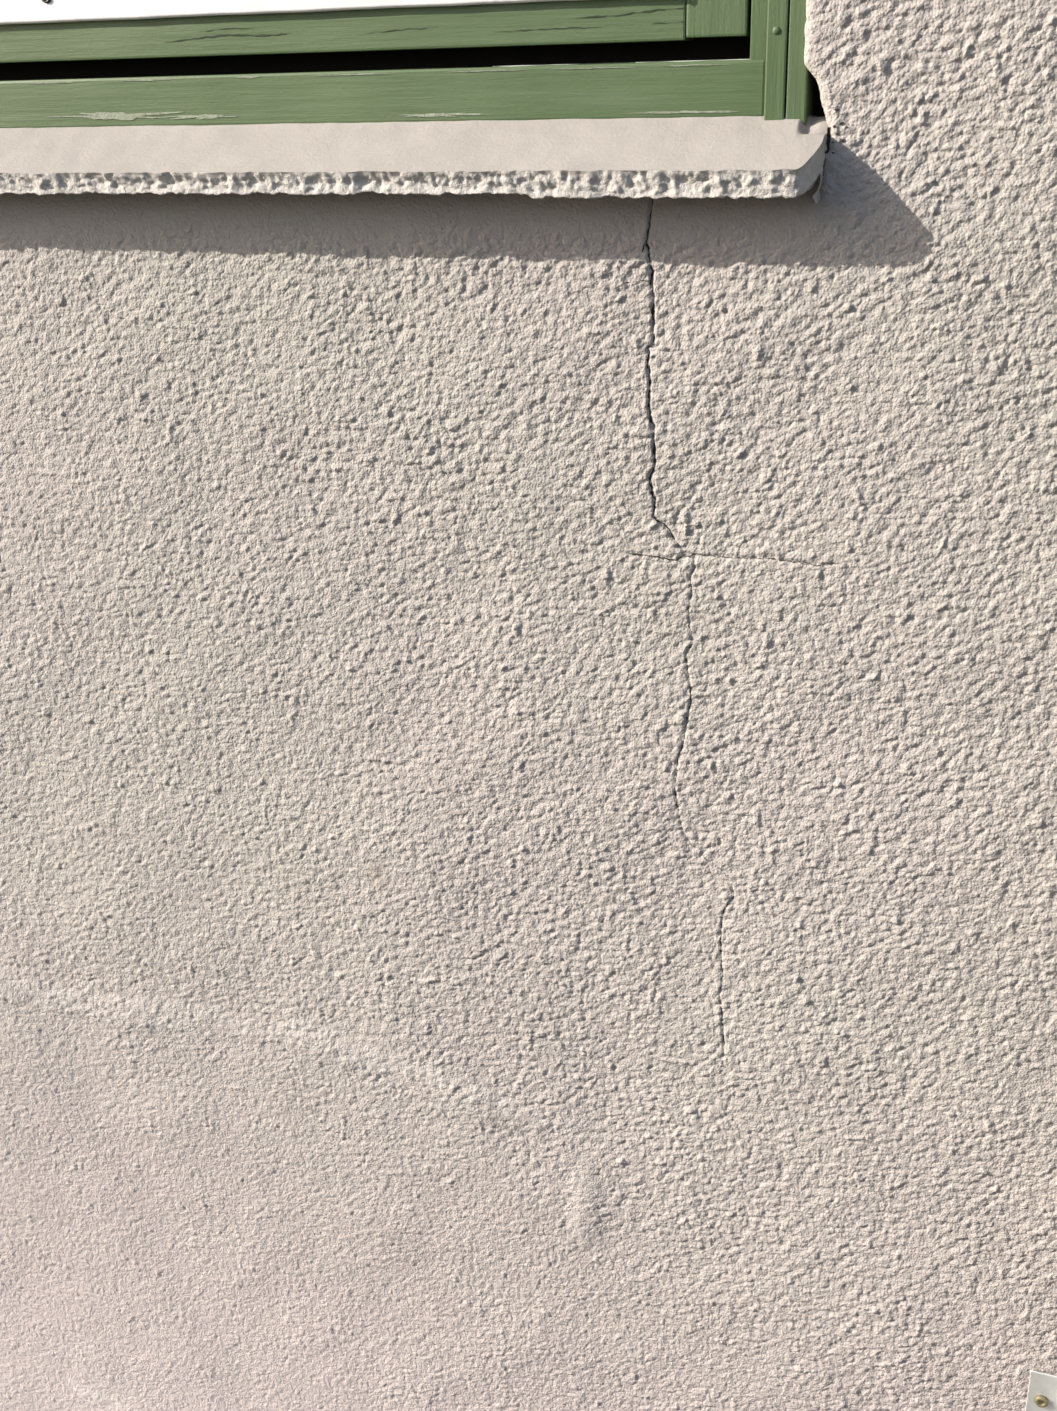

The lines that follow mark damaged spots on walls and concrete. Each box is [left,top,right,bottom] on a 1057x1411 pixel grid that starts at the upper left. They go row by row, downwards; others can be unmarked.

crack [623,199,838,1051]